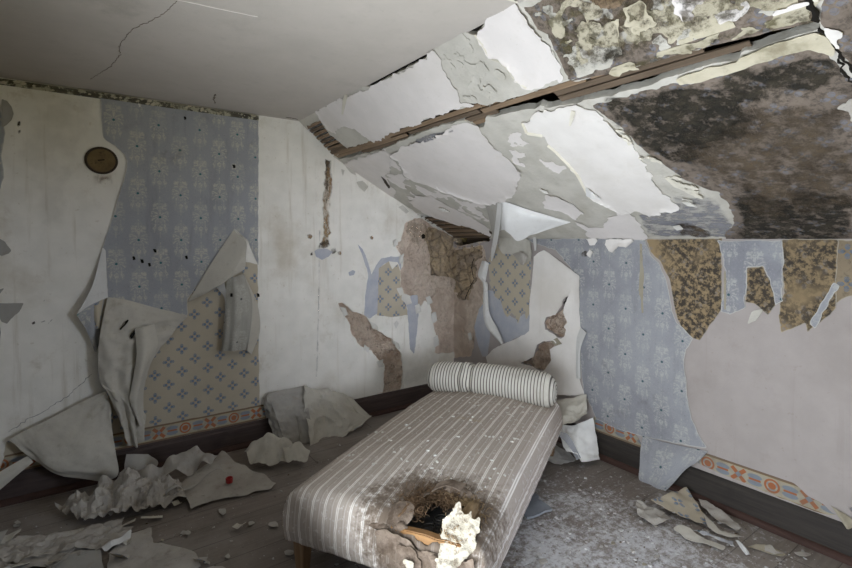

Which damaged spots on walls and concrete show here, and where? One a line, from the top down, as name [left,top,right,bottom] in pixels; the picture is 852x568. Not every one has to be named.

crack [90,0,257,79]
water stain [541,0,703,69]
crack [805,0,852,83]
peeling [307,0,820,358]
water stain [605,57,852,239]
peeling [837,98,852,122]
spalling [338,303,403,394]
spalling [524,308,567,370]